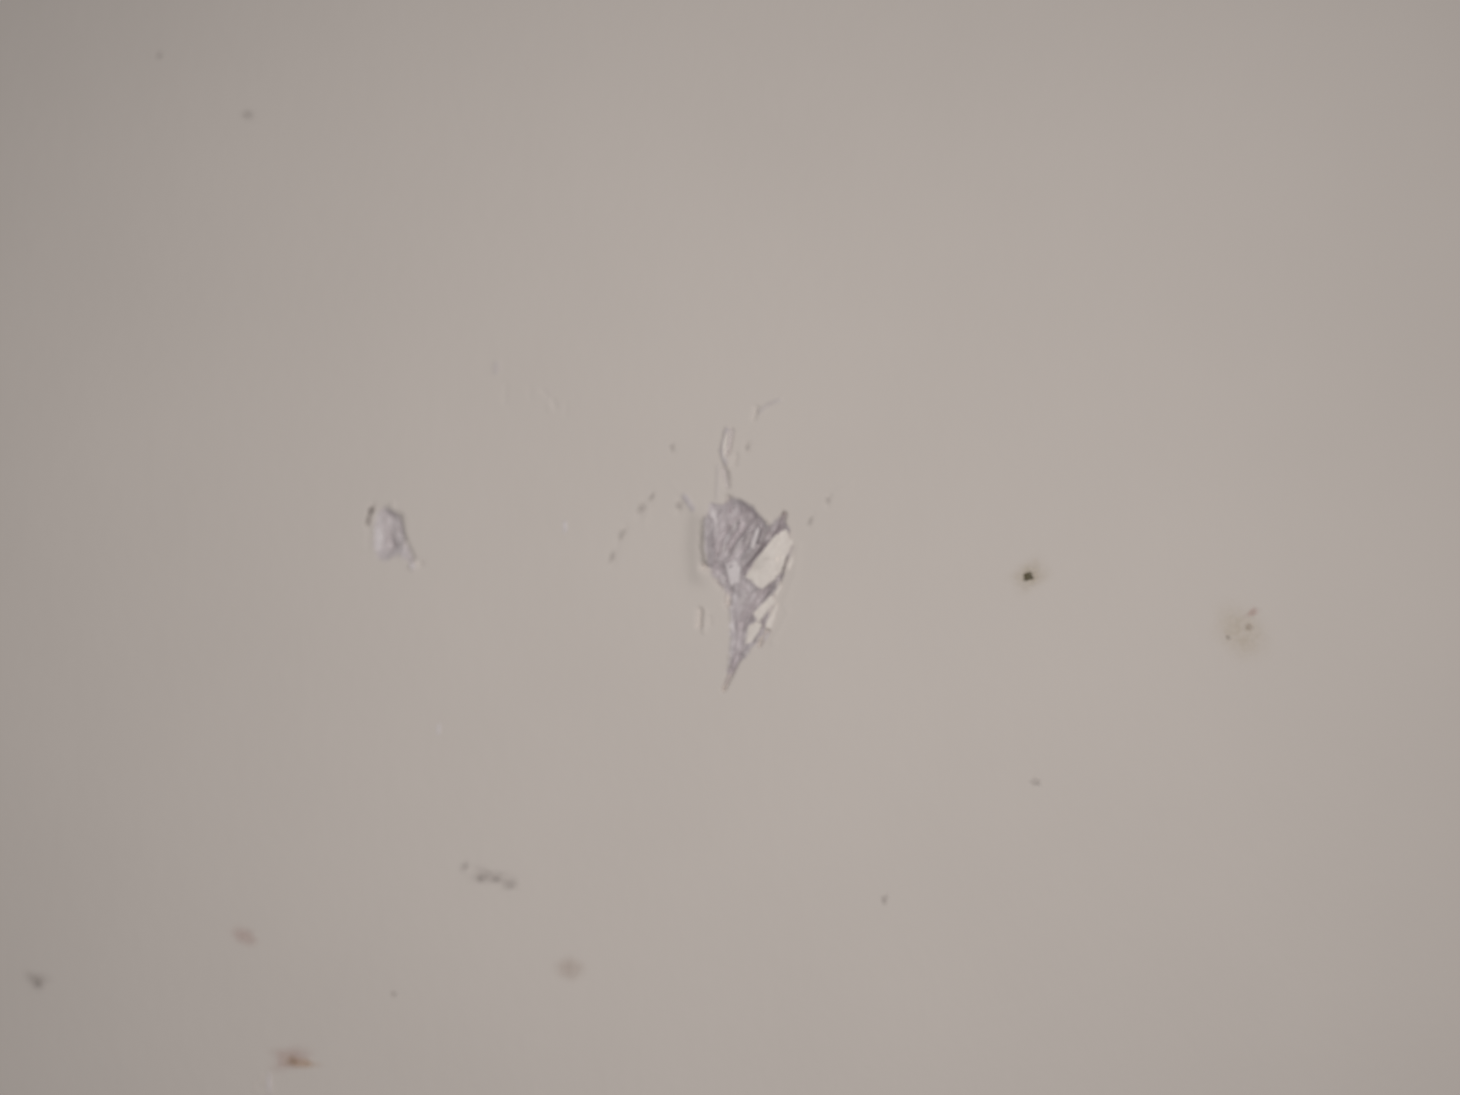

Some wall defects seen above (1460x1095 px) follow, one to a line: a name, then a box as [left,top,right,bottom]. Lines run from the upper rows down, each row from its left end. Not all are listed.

spalling [363,500,426,573]
spalling [605,396,854,694]